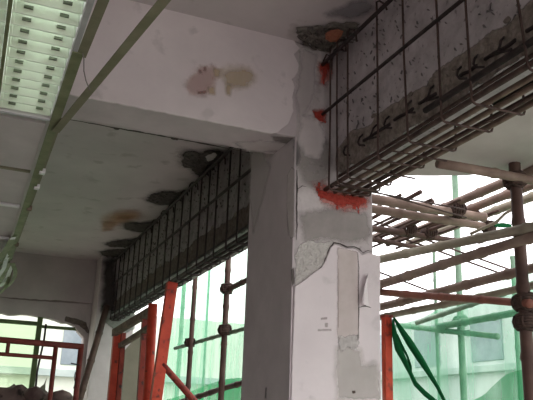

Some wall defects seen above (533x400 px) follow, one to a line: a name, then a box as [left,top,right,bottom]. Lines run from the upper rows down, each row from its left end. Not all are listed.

spalling [296,22,359,52]
spalling [338,0,533,173]
spalling [182,149,229,178]
spalling [147,192,181,205]
spalling [100,222,156,258]
crack [313,242,372,273]
spalling [106,310,135,329]
peeling [290,240,381,400]